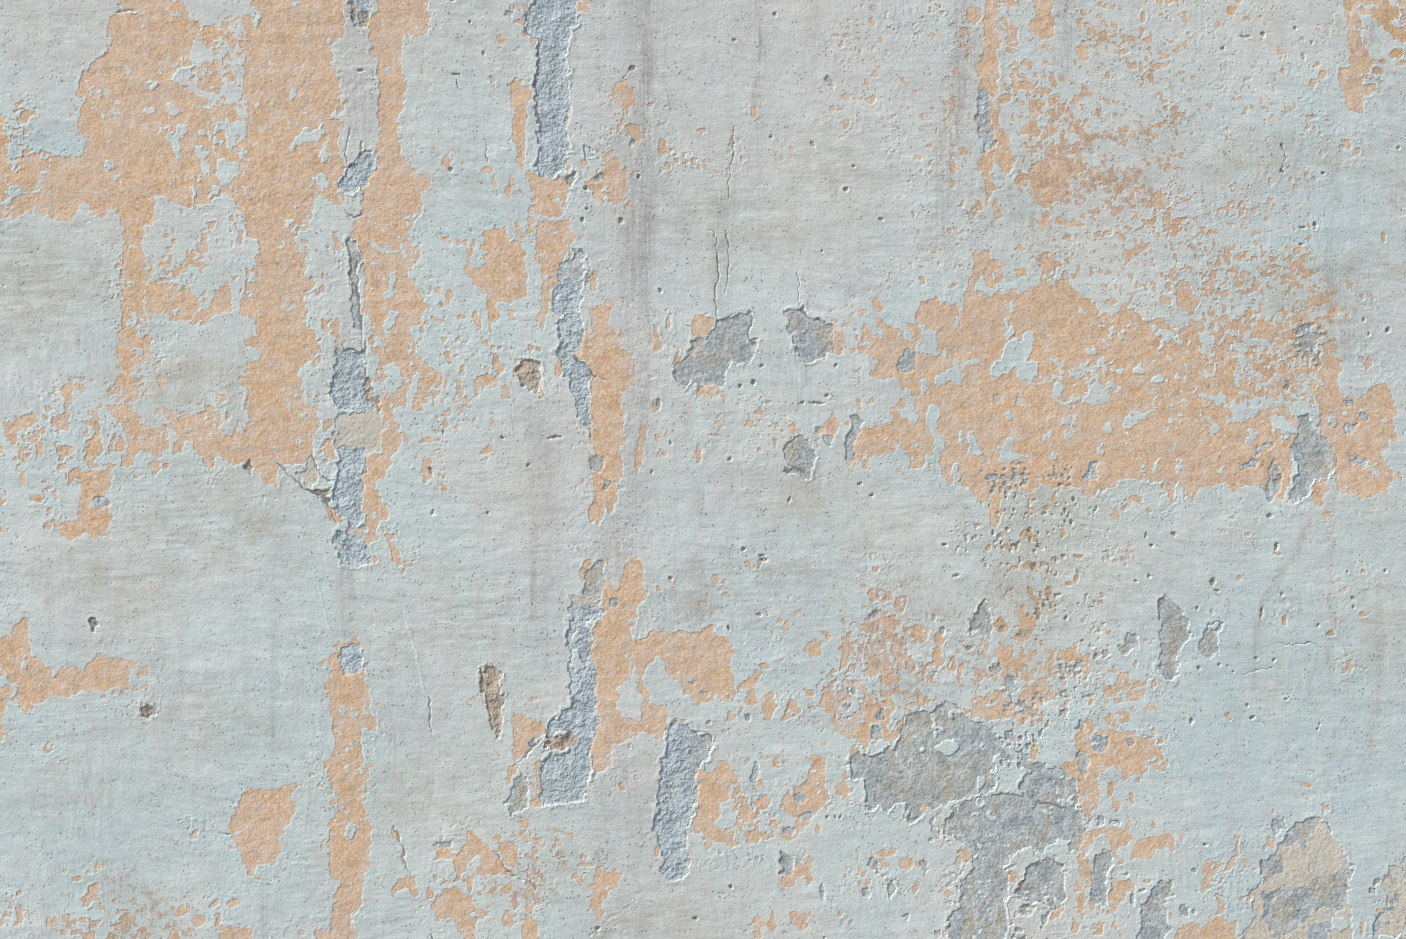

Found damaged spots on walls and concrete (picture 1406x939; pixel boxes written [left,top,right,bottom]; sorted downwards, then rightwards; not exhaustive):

peeling [0,0,745,573]
peeling [591,0,1406,939]
peeling [0,618,164,746]
peeling [0,856,253,939]
peeling [188,618,623,939]